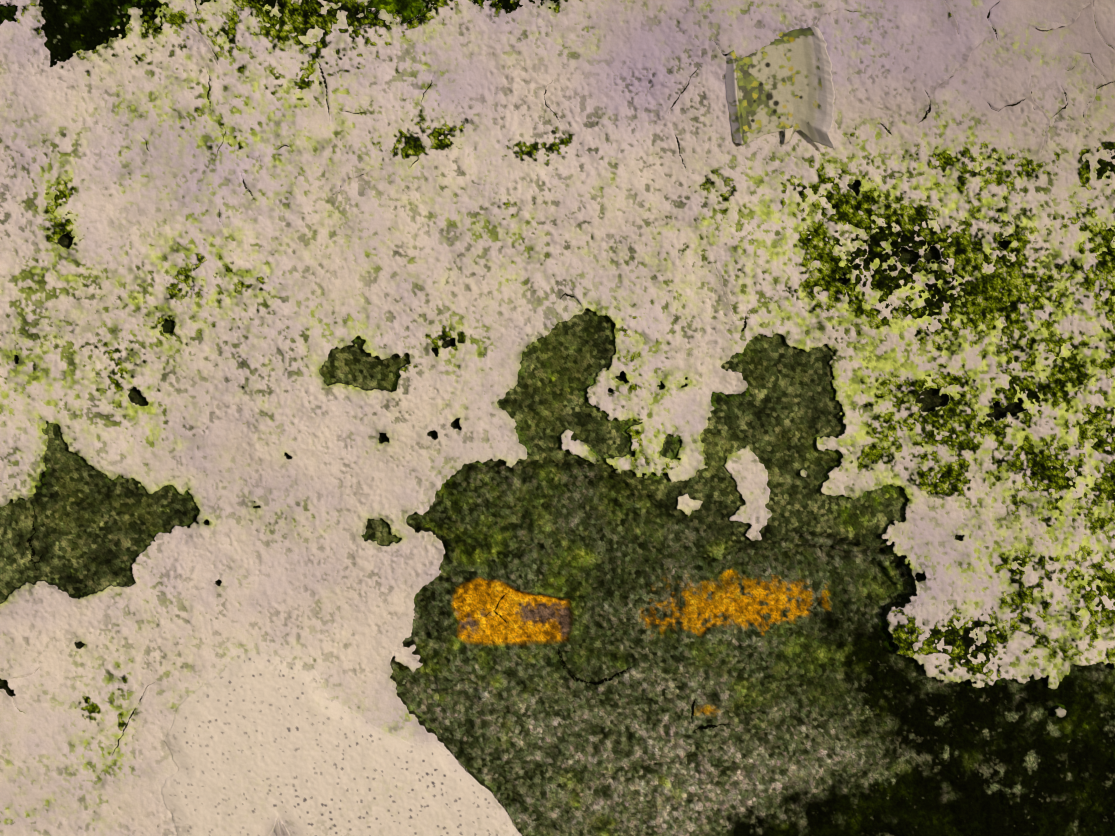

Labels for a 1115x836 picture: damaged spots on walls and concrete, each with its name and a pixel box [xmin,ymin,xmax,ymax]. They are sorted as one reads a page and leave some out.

peeling [0,2,18,25]
peeling [39,0,169,67]
peeling [365,0,432,24]
peeling [472,0,559,14]
crack [920,1,1000,122]
crack [987,0,1113,152]
spalling [59,233,74,248]
spalling [898,245,938,264]
peeling [319,336,410,391]
peeling [0,421,209,603]
peeling [362,518,402,545]
spalling [391,308,923,836]